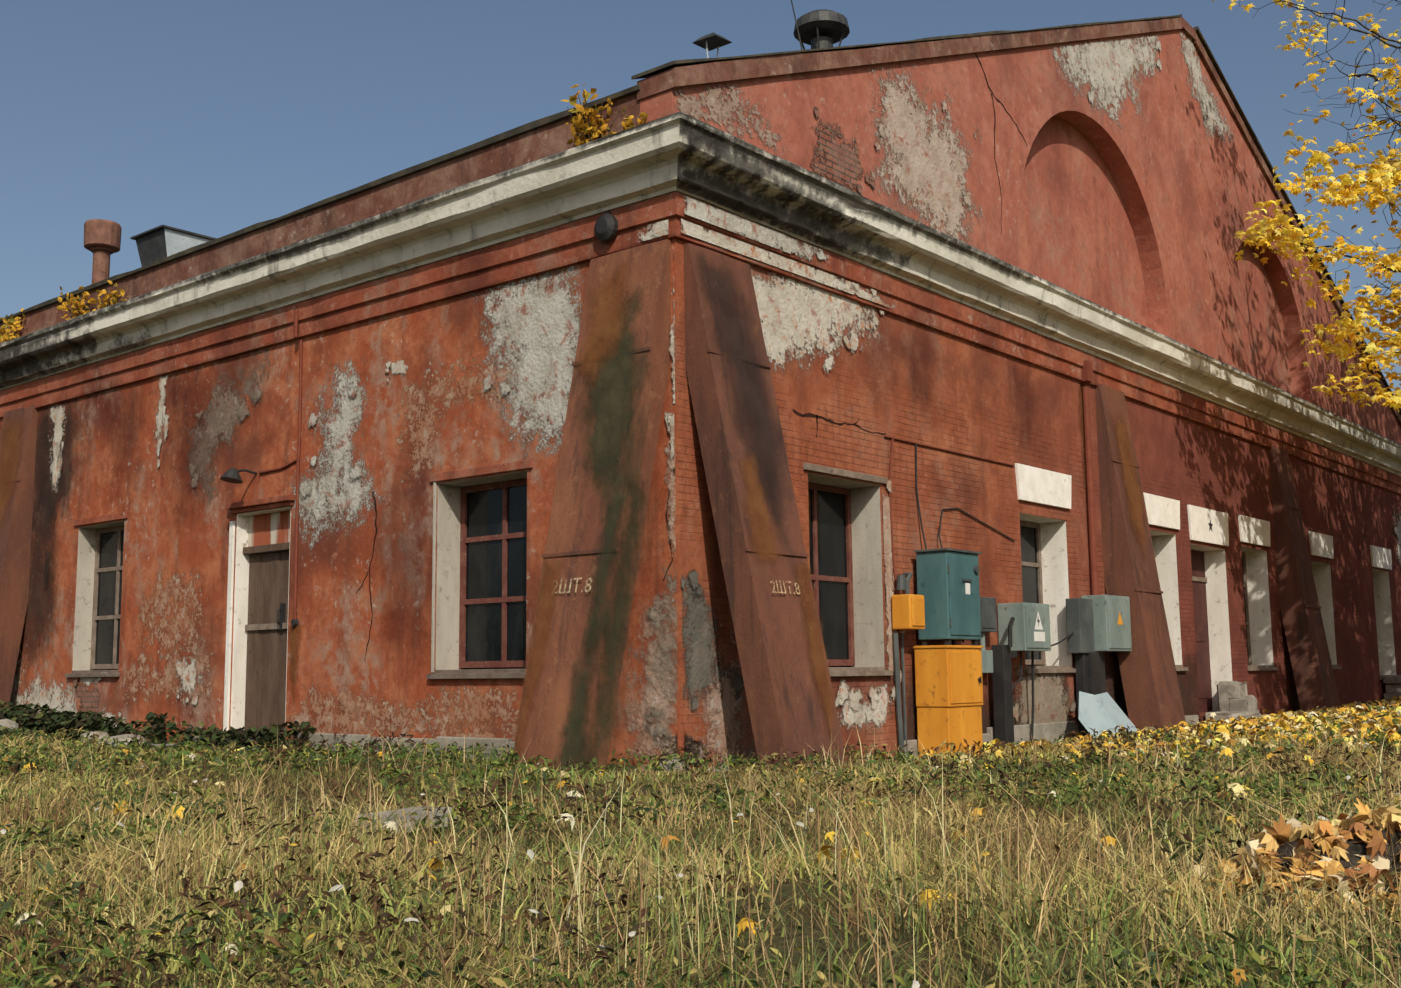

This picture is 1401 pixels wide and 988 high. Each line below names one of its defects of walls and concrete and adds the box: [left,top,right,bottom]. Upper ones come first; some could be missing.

peeling [810,66,985,241]
crack [975,53,1028,235]
peeling [1053,35,1164,127]
peeling [185,349,270,504]
peeling [291,360,384,548]
peeling [473,266,583,459]
peeling [637,196,895,373]
crack [793,409,886,438]
crack [356,488,378,662]
water stain [625,617,677,761]
peeling [835,479,907,731]